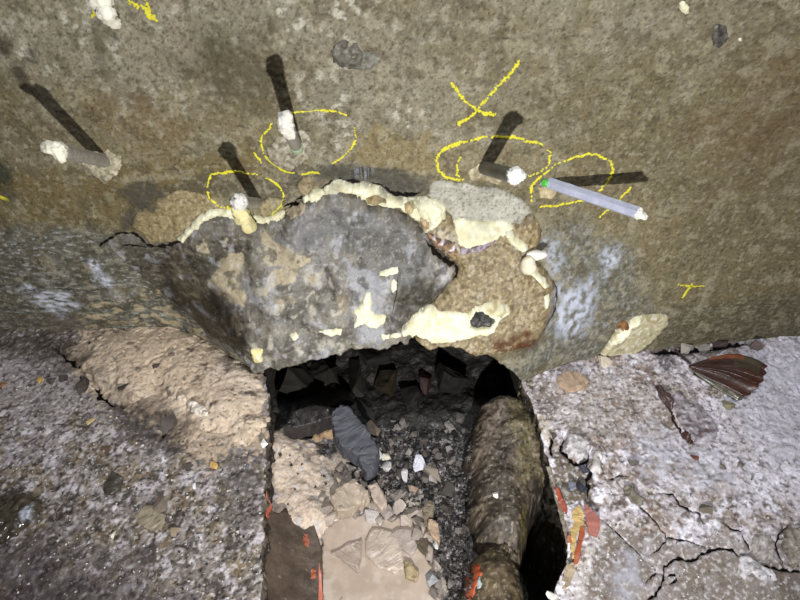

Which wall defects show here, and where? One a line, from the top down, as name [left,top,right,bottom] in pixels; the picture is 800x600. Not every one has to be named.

crack [100,226,191,248]
peeling [131,190,226,244]
peeling [259,176,330,220]
peeling [366,195,387,205]
spalling [404,200,458,256]
spalling [538,186,557,199]
peeling [475,300,510,318]
leakage [557,279,594,334]
crack [55,348,123,409]
crack [549,439,628,498]
crack [660,493,705,524]
crack [600,507,800,600]